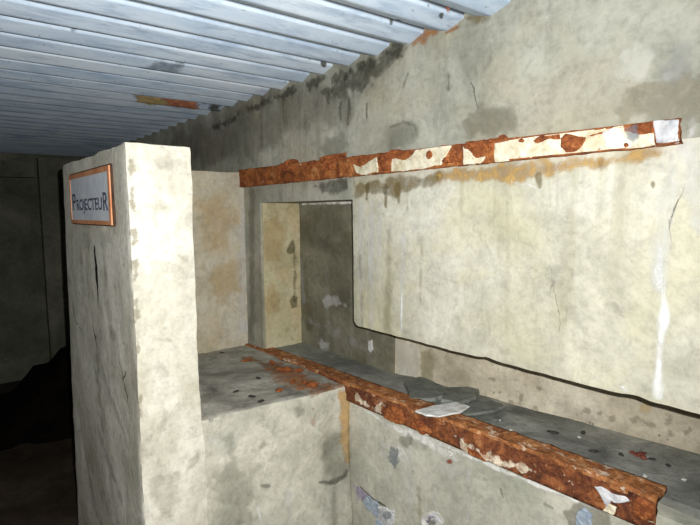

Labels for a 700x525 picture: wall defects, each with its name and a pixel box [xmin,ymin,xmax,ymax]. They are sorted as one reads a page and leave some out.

rust [136,95,199,109]
rust [534,132,603,152]
peeling [494,119,679,162]
rust [624,122,659,161]
peeling [353,157,378,176]
peeling [391,145,451,172]
peeling [463,147,485,165]
rust [437,158,608,183]
crack [92,245,100,296]
damp [653,250,670,399]
rust [266,360,332,392]